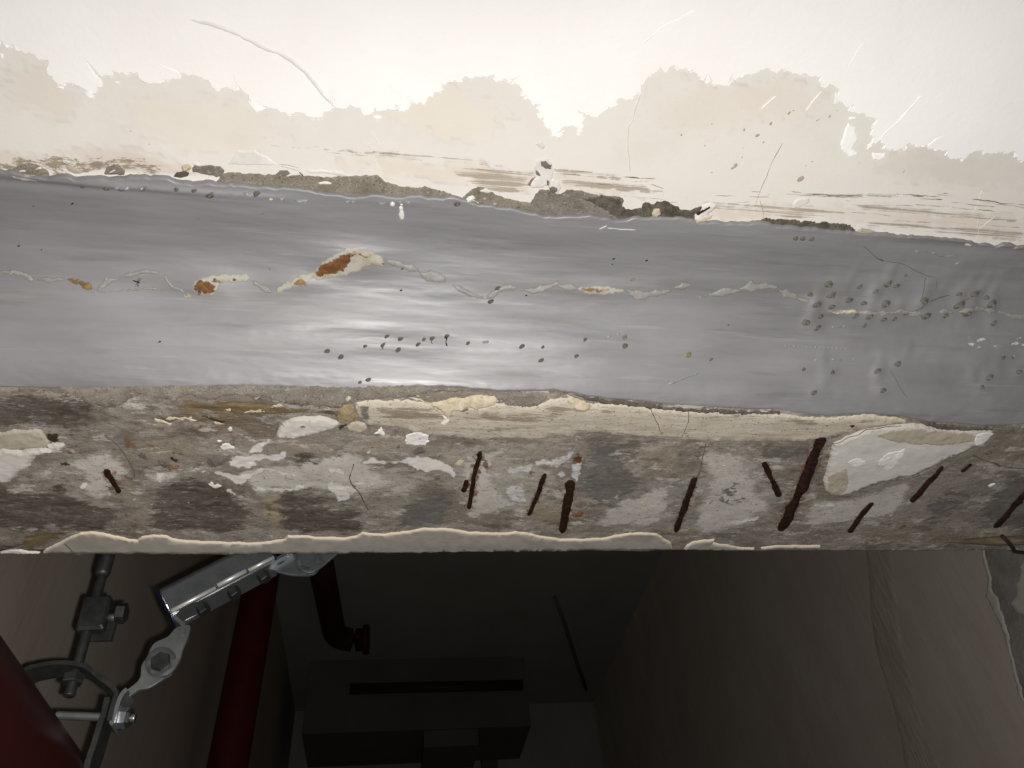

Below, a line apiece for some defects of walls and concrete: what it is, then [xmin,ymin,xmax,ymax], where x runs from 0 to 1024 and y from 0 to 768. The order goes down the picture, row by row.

crack [190,19,332,106]
peeling [0,0,1024,223]
spalling [761,198,876,233]
corrosion [184,273,249,298]
corrosion [277,247,384,293]
spalling [58,385,548,425]
spalling [566,394,781,415]
damp [0,484,117,550]
peeling [202,427,304,495]
damp [148,478,364,535]
peeling [362,432,489,509]
spalling [761,437,836,532]